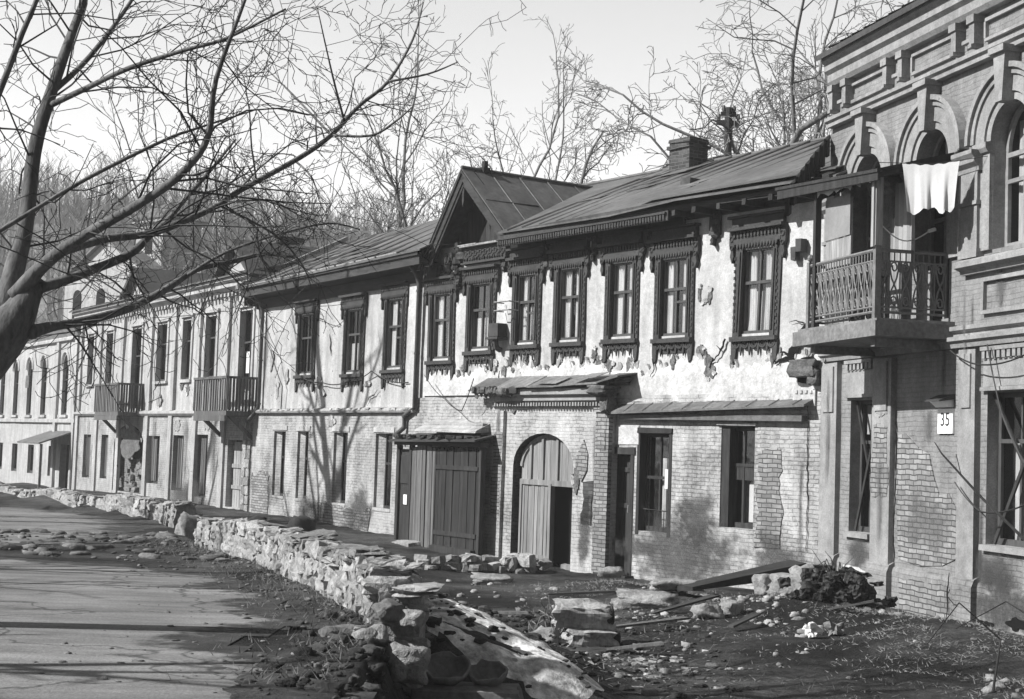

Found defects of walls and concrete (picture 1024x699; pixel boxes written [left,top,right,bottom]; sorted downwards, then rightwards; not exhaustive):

spalling [698,284,713,305]
peeling [423,339,829,414]
flaking render [571,440,594,525]
flaking render [754,447,784,547]
flaking render [870,410,956,566]